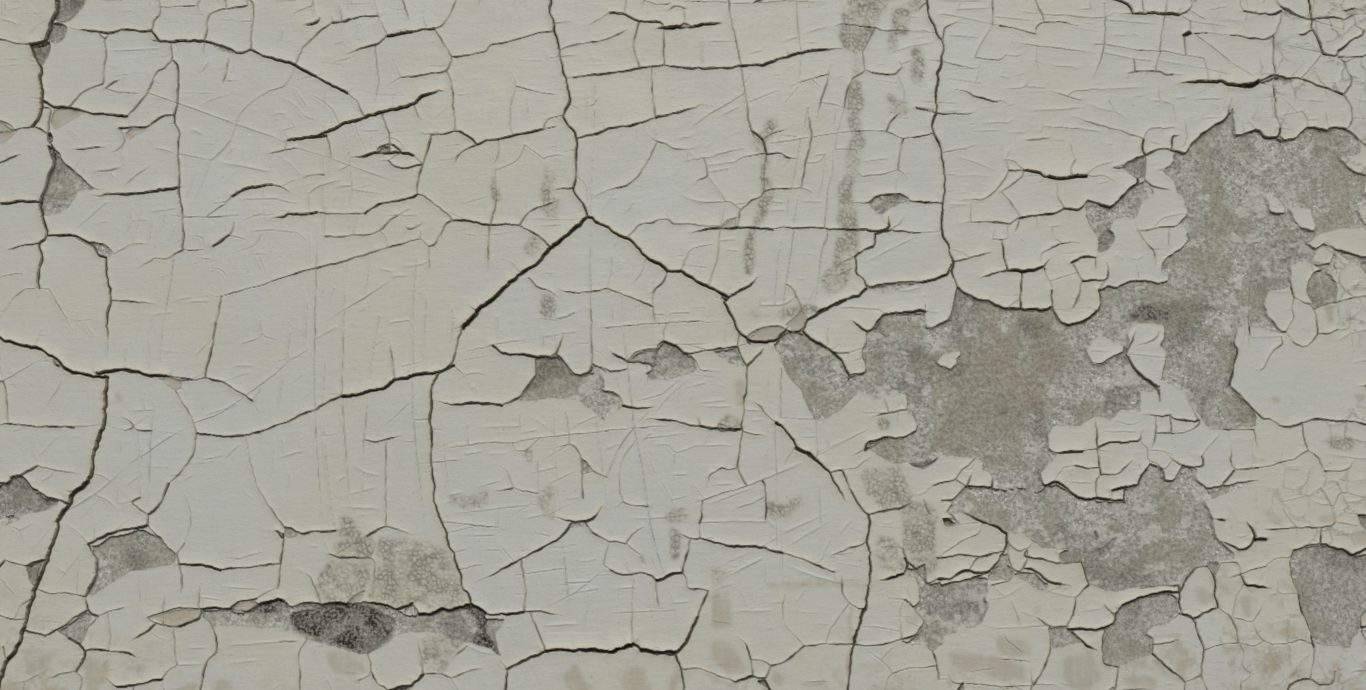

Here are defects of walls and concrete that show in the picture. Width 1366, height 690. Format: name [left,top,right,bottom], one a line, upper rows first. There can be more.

spalling [32,0,88,66]
crack [974,0,1366,147]
crack [960,86,1234,311]
crack [1065,254,1110,326]
crack [0,0,1091,690]
peeling [521,358,622,421]
peeling [631,341,697,381]
peeling [715,109,1366,667]
crack [1044,331,1202,503]
peeling [90,530,177,596]
peeling [150,599,505,656]
crack [1068,601,1120,690]